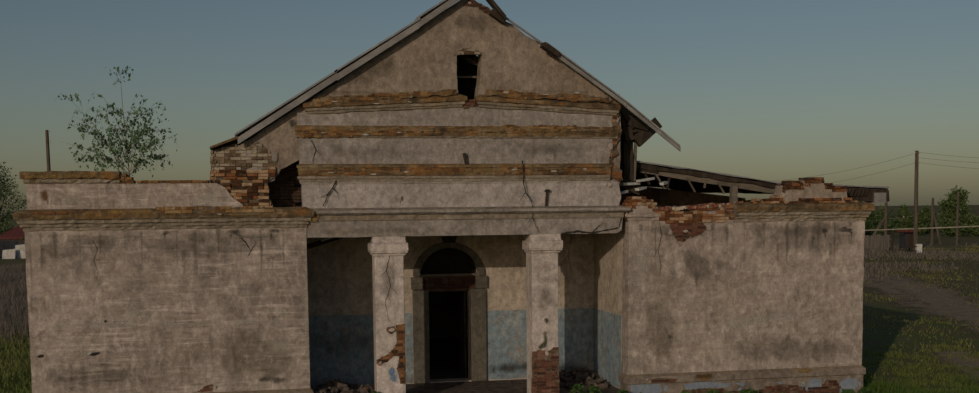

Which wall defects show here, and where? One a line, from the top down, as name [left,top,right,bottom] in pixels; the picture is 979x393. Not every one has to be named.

spalling [156,142,278,215]
crack [519,161,622,272]
spalling [668,223,711,242]
crack [380,256,395,320]
spalling [376,324,406,384]
spalling [531,347,560,393]